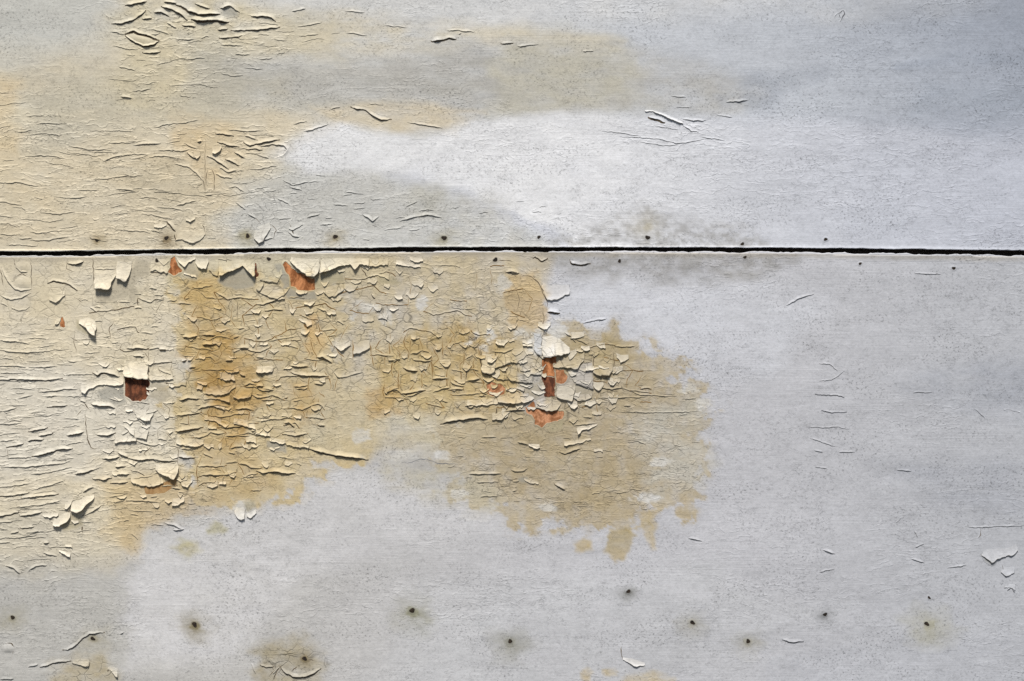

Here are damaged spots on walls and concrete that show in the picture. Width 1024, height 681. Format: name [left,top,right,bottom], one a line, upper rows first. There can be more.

water stain [0,0,629,251]
peeling [151,216,206,243]
peeling [236,202,332,244]
rust [104,261,377,566]
peeling [47,254,634,512]
water stain [0,197,1024,595]
peeling [645,455,676,469]
peeling [42,485,102,557]
peeling [228,498,260,523]
peeling [627,485,665,505]
peeling [980,543,1018,592]